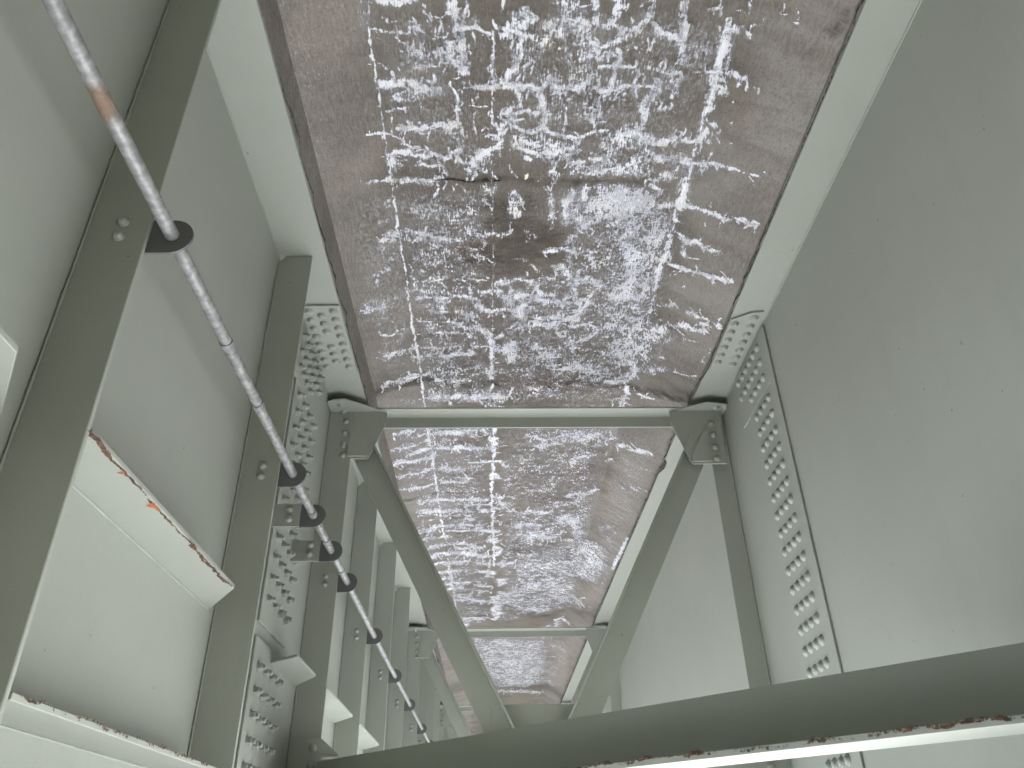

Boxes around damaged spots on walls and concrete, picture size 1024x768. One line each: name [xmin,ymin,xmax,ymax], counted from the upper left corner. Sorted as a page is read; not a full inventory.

water stain [357,0,420,26]
water stain [375,0,708,407]
water stain [360,286,401,345]
crack [280,0,865,704]
rust [88,431,232,586]
water stain [400,428,647,621]
water stain [474,637,573,696]
rust [22,695,208,766]
rust [578,750,714,768]
rust [868,715,1024,737]